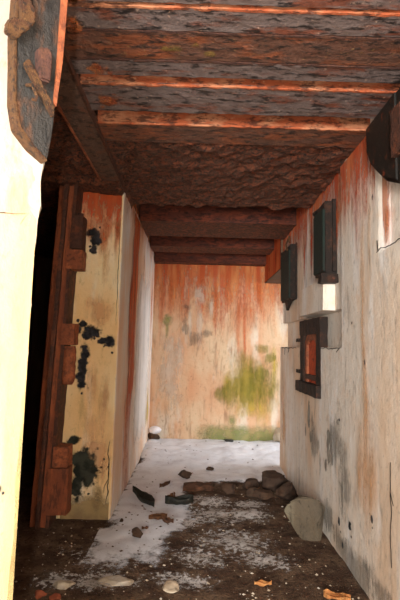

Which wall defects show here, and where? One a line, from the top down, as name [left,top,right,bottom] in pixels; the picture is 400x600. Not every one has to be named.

corrosion [125,204,145,438]
corrosion [154,136,389,351]
crack [387,463,395,568]